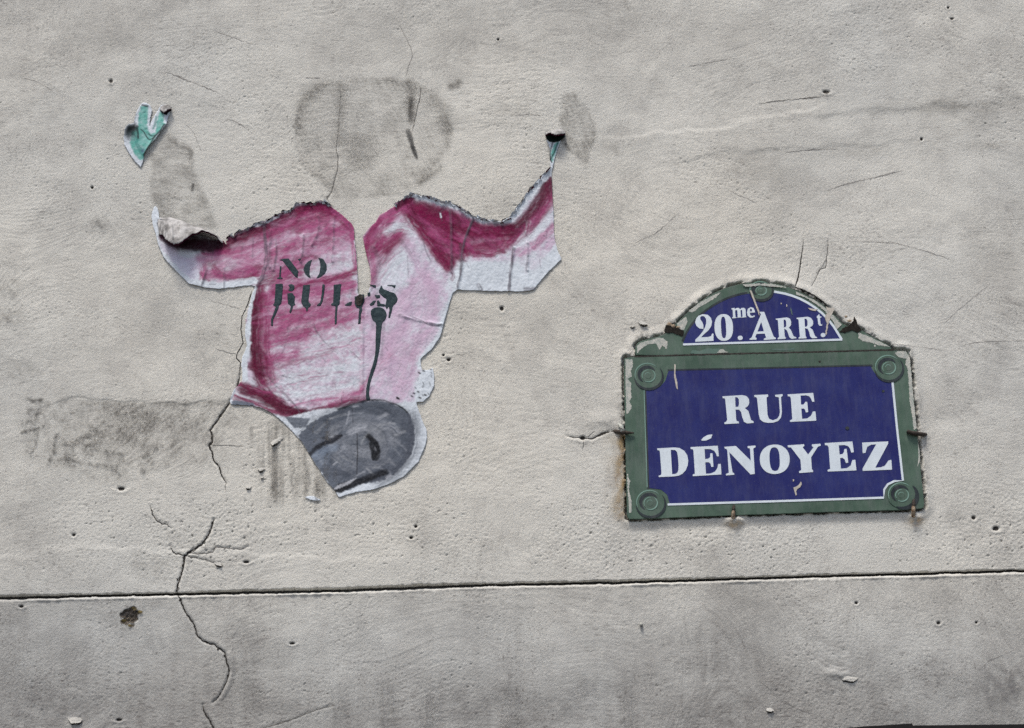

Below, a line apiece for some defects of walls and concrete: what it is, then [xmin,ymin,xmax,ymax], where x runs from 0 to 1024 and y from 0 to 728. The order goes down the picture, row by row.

crack [208,291,252,487]
crack [569,430,613,448]
spalling [120,607,142,627]
crack [150,506,246,728]